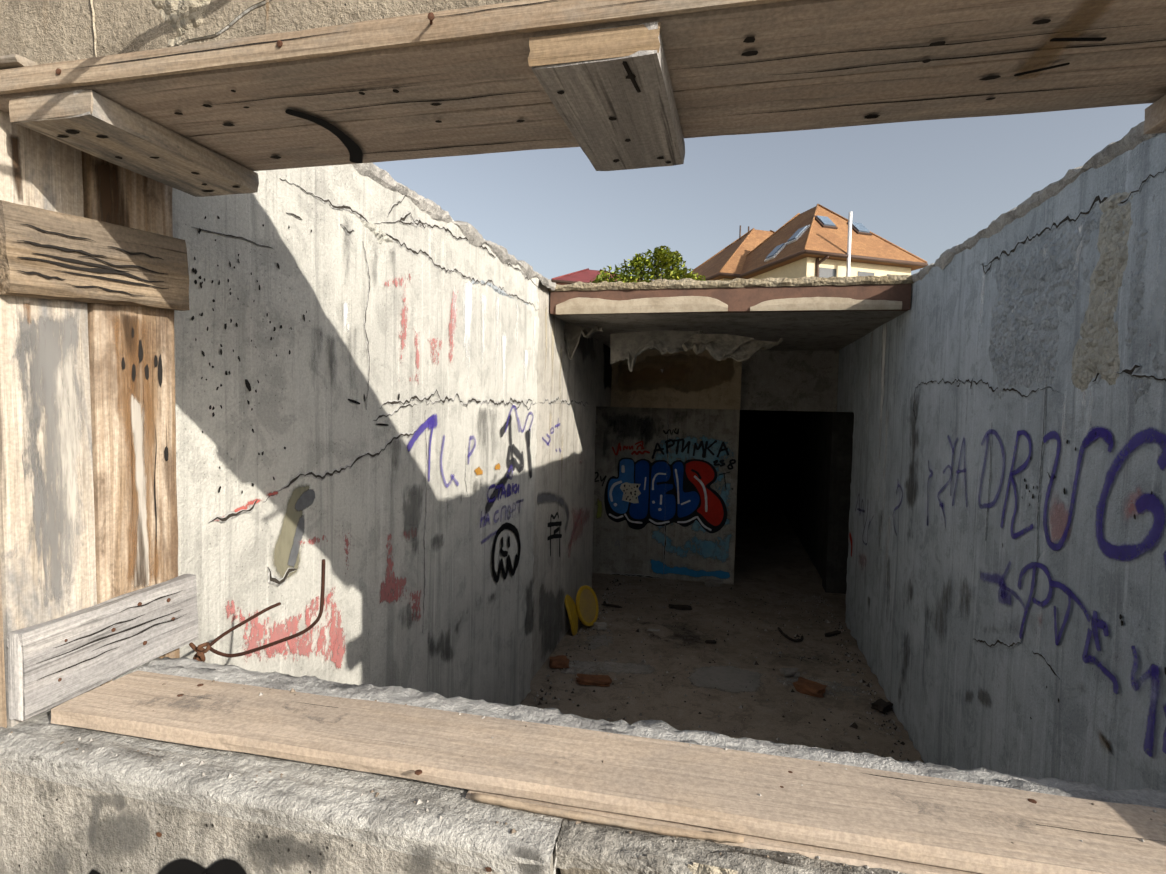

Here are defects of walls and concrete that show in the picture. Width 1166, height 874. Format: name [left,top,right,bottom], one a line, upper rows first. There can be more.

spalling [149,0,211,47]
crack [172,0,270,47]
crack [192,227,271,248]
crack [981,168,1166,276]
spalling [988,191,1166,404]
crack [264,178,589,633]
crack [1093,362,1166,384]
crack [913,377,1059,604]